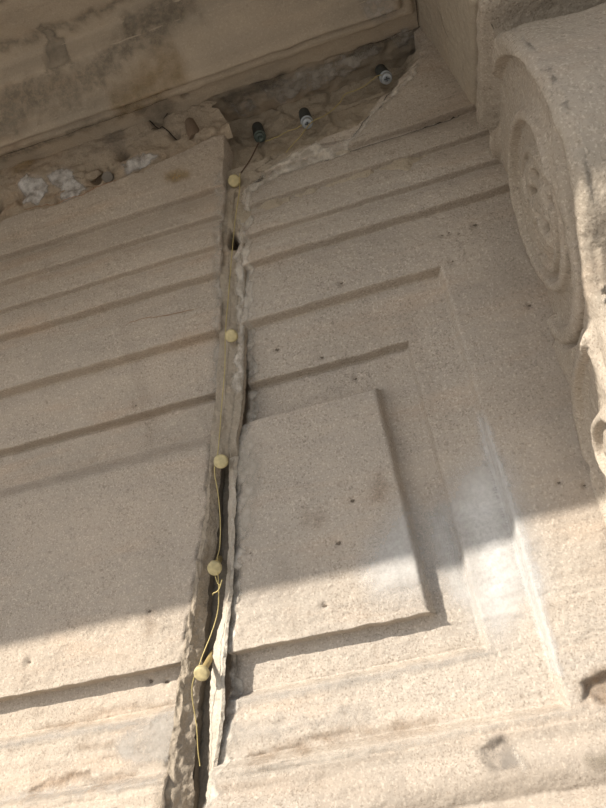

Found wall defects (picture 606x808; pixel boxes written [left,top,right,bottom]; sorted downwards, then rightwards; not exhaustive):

spalling [0,49,427,233]
crack [155,88,459,808]